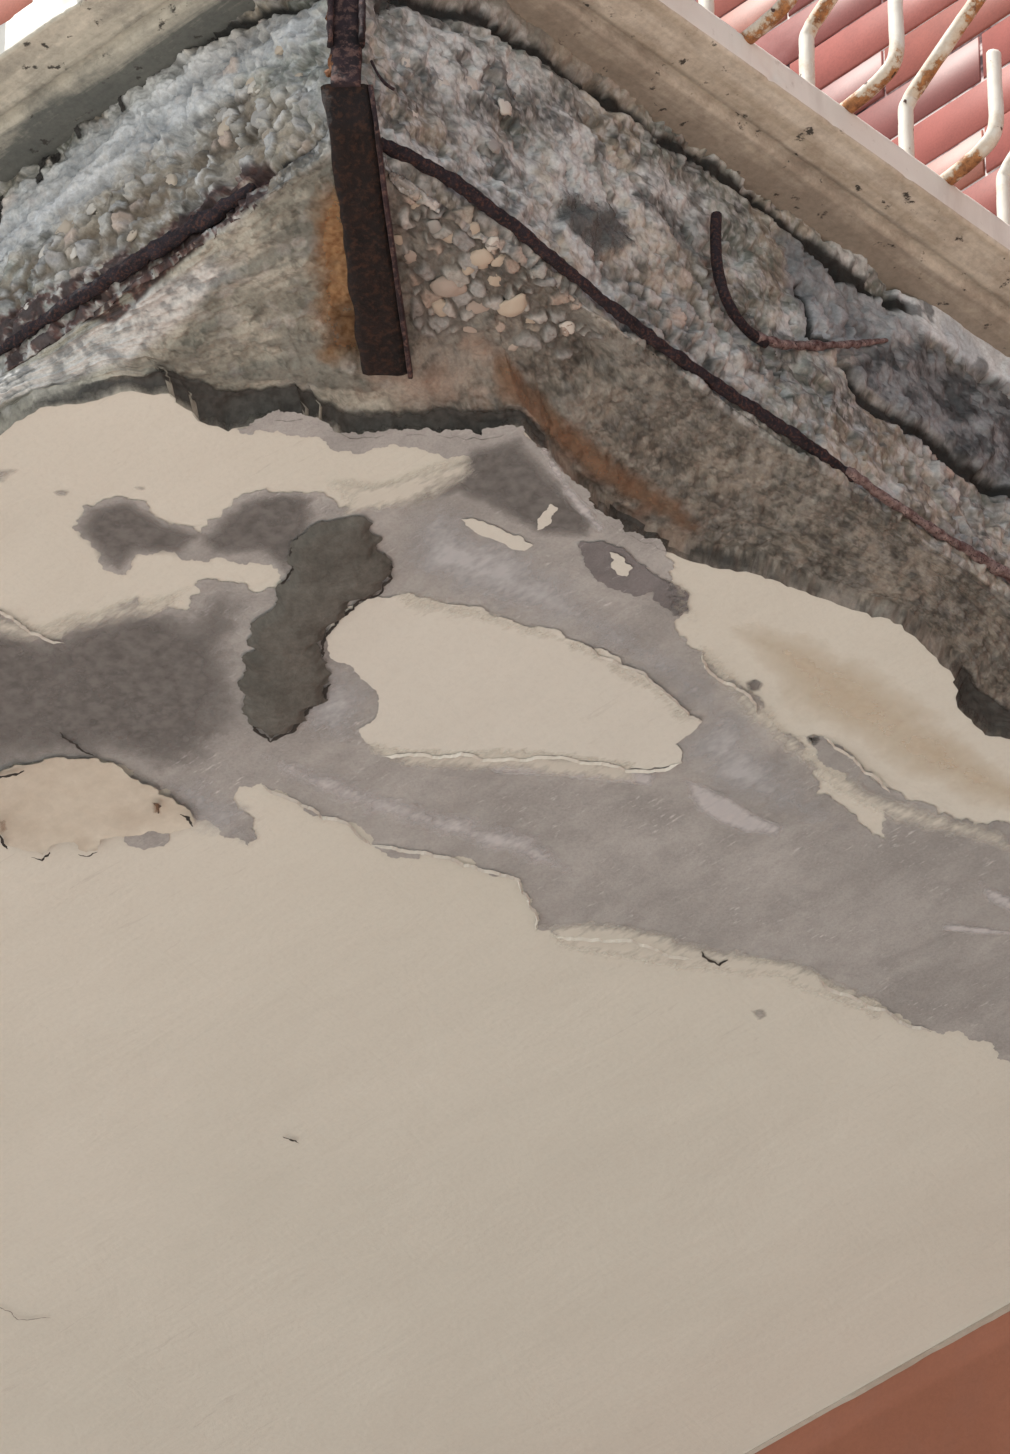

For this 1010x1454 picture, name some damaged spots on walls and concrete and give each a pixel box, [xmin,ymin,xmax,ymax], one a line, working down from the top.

crack [388,0,905,311]
rust [318,194,358,355]
crack [793,289,828,342]
crack [845,374,1010,499]
peeling [0,0,1010,1062]